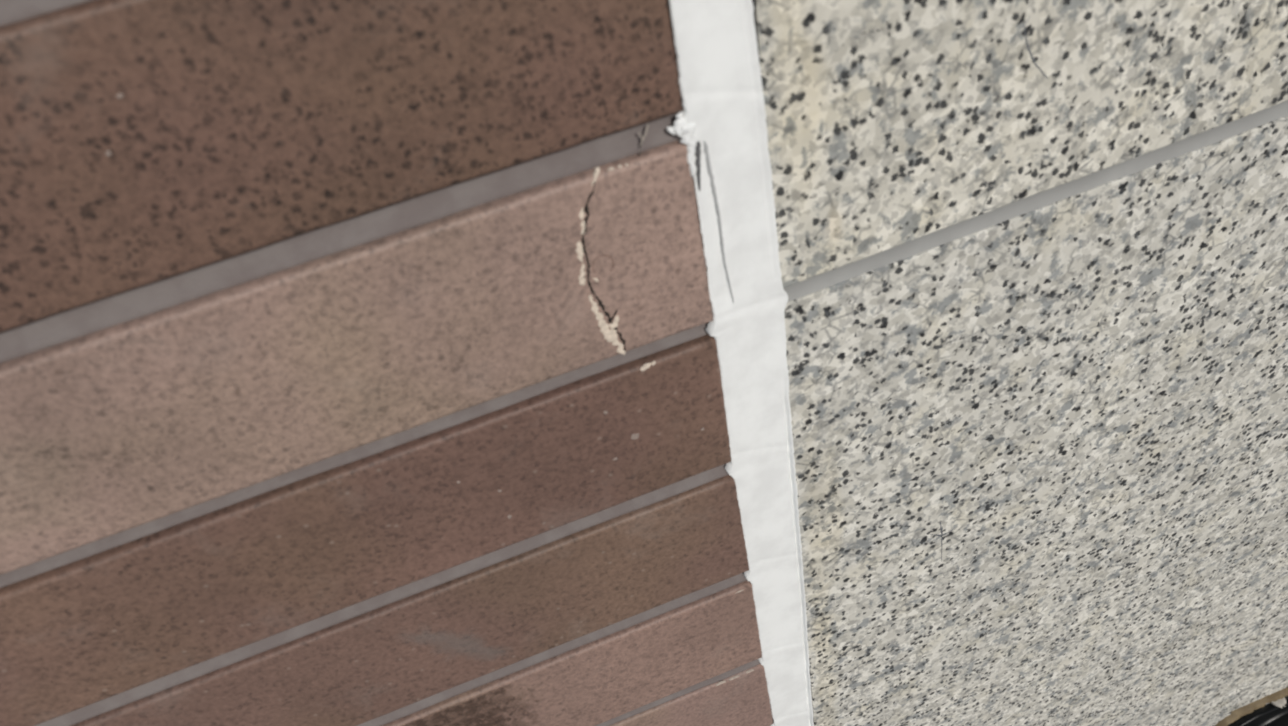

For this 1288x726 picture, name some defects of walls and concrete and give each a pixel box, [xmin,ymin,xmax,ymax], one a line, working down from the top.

crack [576,167,626,355]